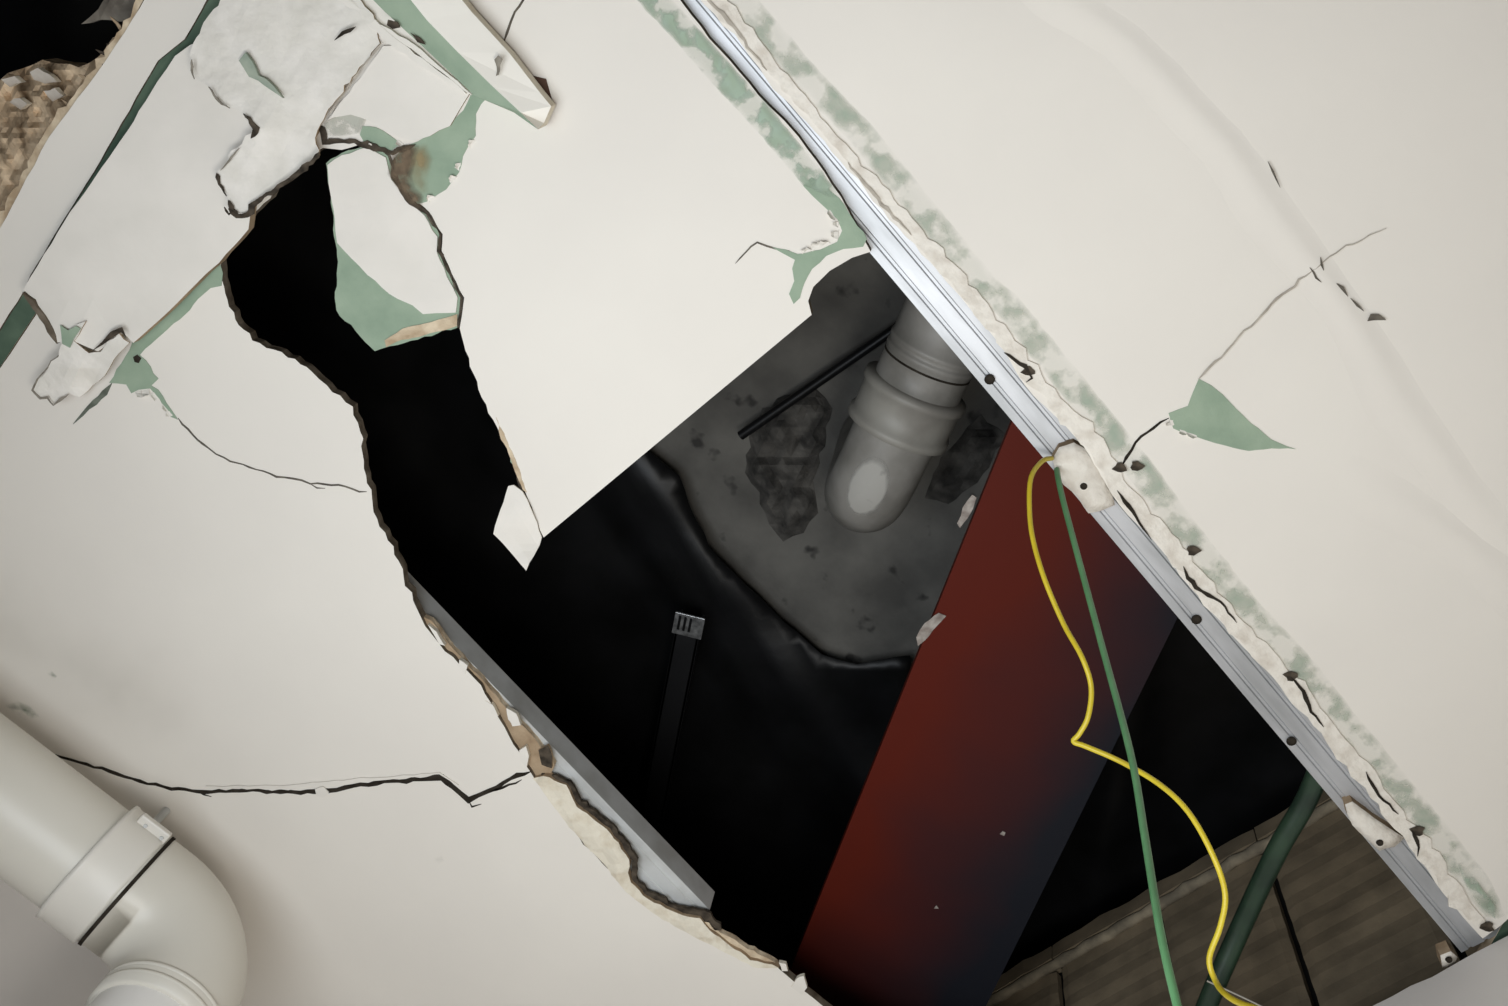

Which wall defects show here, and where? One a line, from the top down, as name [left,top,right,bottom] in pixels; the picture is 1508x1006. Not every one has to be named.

peeling [327,95,485,204]
peeling [639,0,867,304]
peeling [109,265,223,420]
crack [735,242,789,264]
crack [1199,228,1386,379]
crack [178,418,367,493]
spalling [745,389,832,542]
peeling [1053,374,1164,495]
peeling [1166,379,1294,451]
peeling [916,613,946,646]
crack [55,754,531,808]
spalling [424,613,807,994]